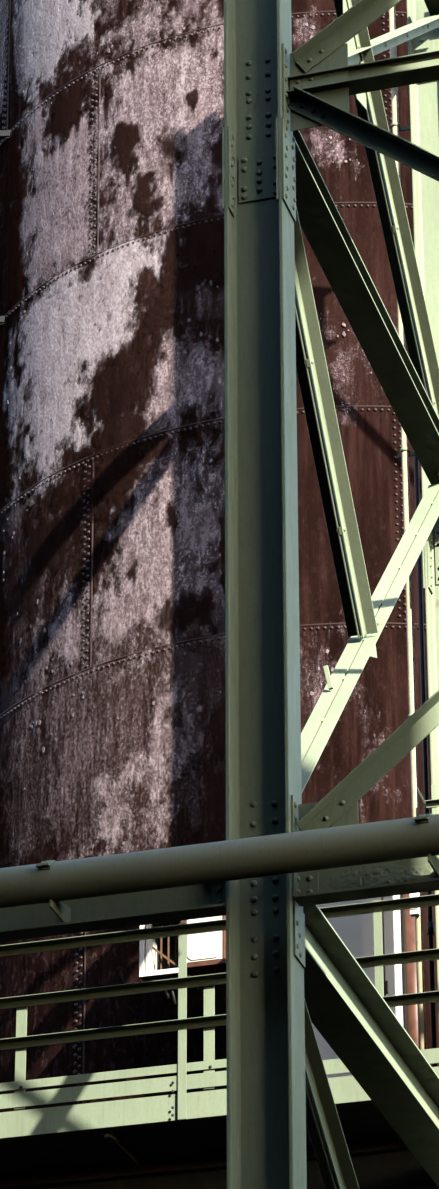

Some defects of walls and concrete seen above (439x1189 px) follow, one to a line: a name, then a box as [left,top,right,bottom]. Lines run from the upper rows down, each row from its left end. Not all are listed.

corrosion [0,79,163,511]
peeling [0,0,224,582]
corrosion [0,213,225,676]
corrosion [158,128,188,180]
corrosion [186,89,198,113]